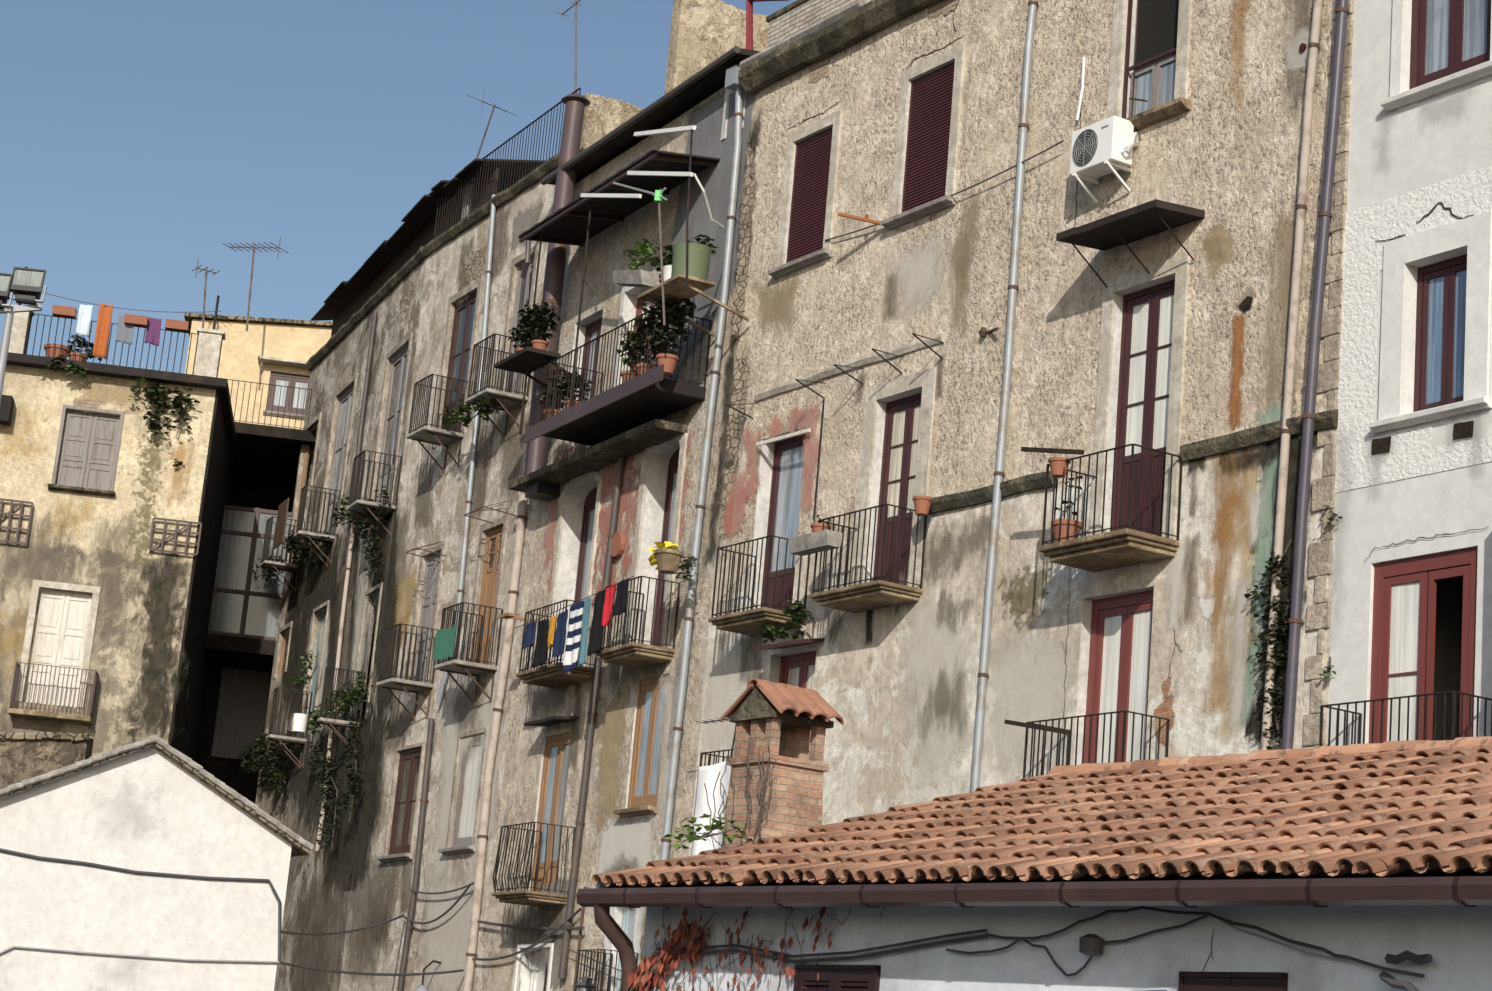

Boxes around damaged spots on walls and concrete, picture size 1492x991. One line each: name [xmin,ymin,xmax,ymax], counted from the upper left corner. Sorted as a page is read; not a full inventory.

flaking render [719,140,819,541]
corrosion [1229,314,1244,430]
damp [1,521,82,591]
damp [102,435,188,741]
flaking render [1154,676,1175,746]
corrosion [1213,457,1239,705]